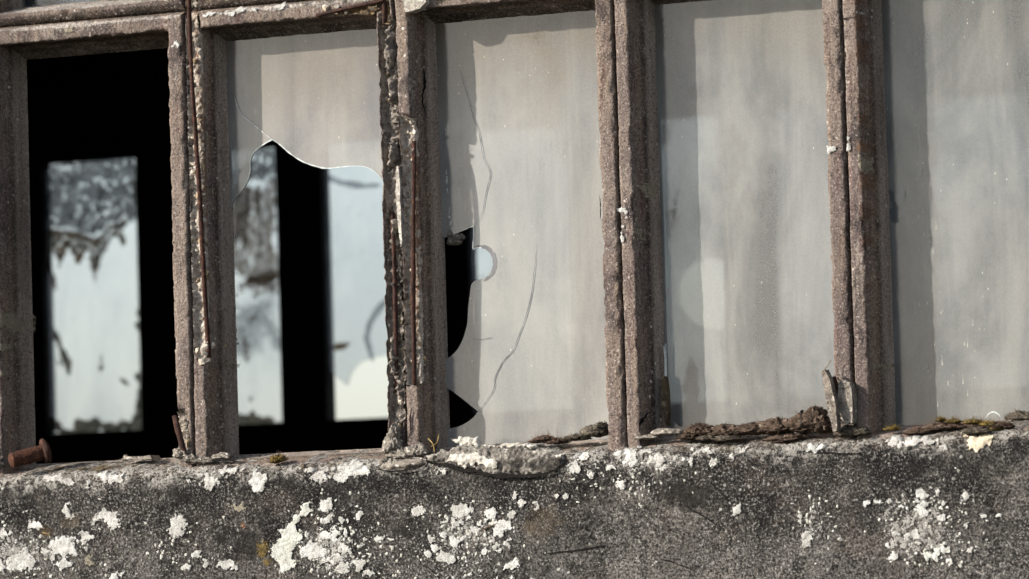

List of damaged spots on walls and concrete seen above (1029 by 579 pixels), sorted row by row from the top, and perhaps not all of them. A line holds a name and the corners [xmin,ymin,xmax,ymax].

spalling [315,0,429,429]